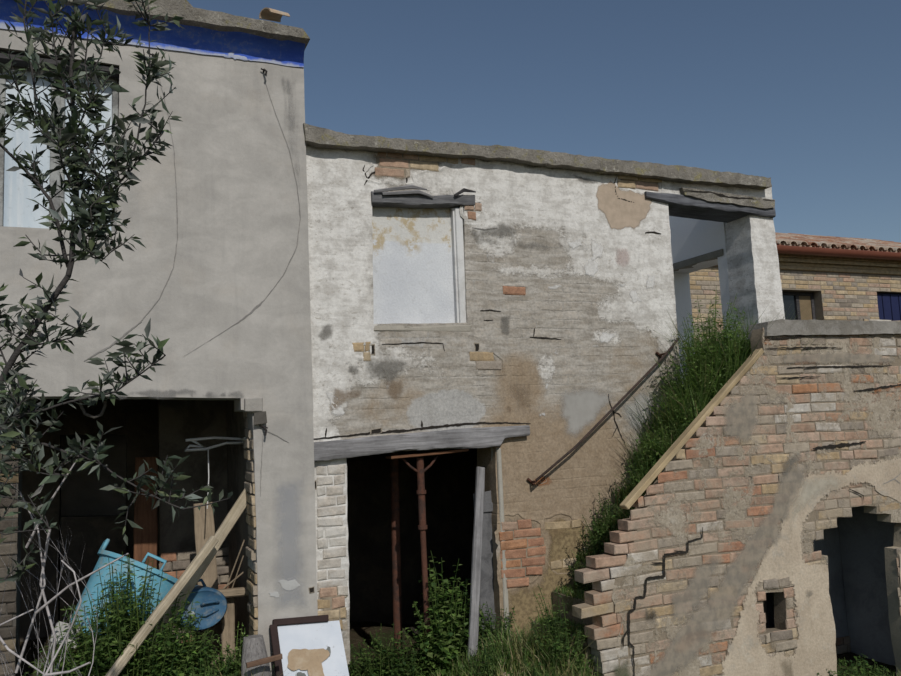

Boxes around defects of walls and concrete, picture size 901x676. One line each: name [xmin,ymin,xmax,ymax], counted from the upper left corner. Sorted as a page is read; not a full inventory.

crack [84,78,178,361]
crack [186,79,301,355]
spalling [361,151,477,186]
spalling [596,175,665,229]
spalling [495,510,591,593]
crack [623,527,703,676]